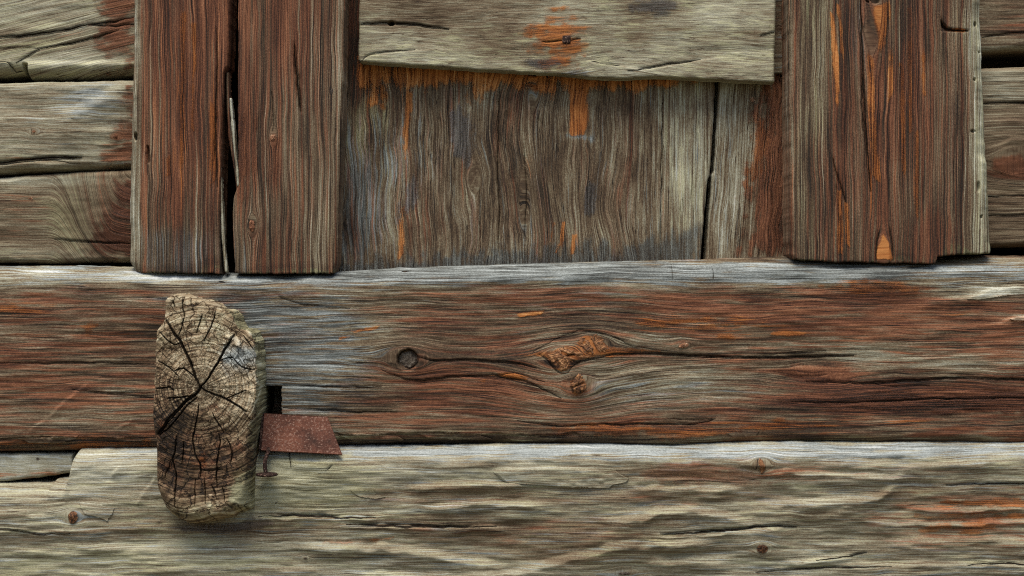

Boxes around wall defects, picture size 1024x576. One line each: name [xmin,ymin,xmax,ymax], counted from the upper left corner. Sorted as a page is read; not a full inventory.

corrosion [525,6,587,66]
crack [0,297,253,506]